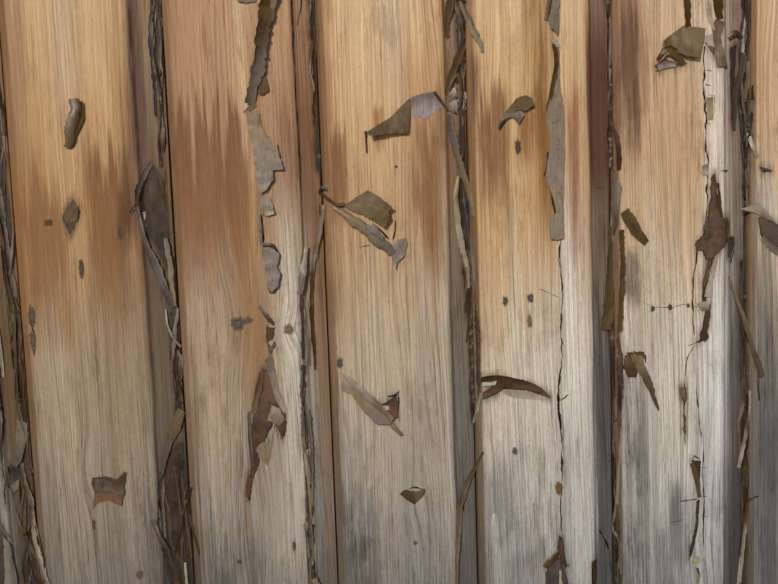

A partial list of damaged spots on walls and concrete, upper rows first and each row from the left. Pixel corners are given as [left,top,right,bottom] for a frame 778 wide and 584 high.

peeling [129,161,181,347]
peeling [237,0,283,294]
peeling [297,186,408,370]
peeling [364,0,550,423]
peeling [544,0,565,240]
peeling [654,0,759,158]
peeling [688,174,735,346]
peeling [742,203,778,255]
peeling [246,306,287,501]
peeling [337,358,403,436]
crack [539,239,568,531]
peeling [543,536,569,584]